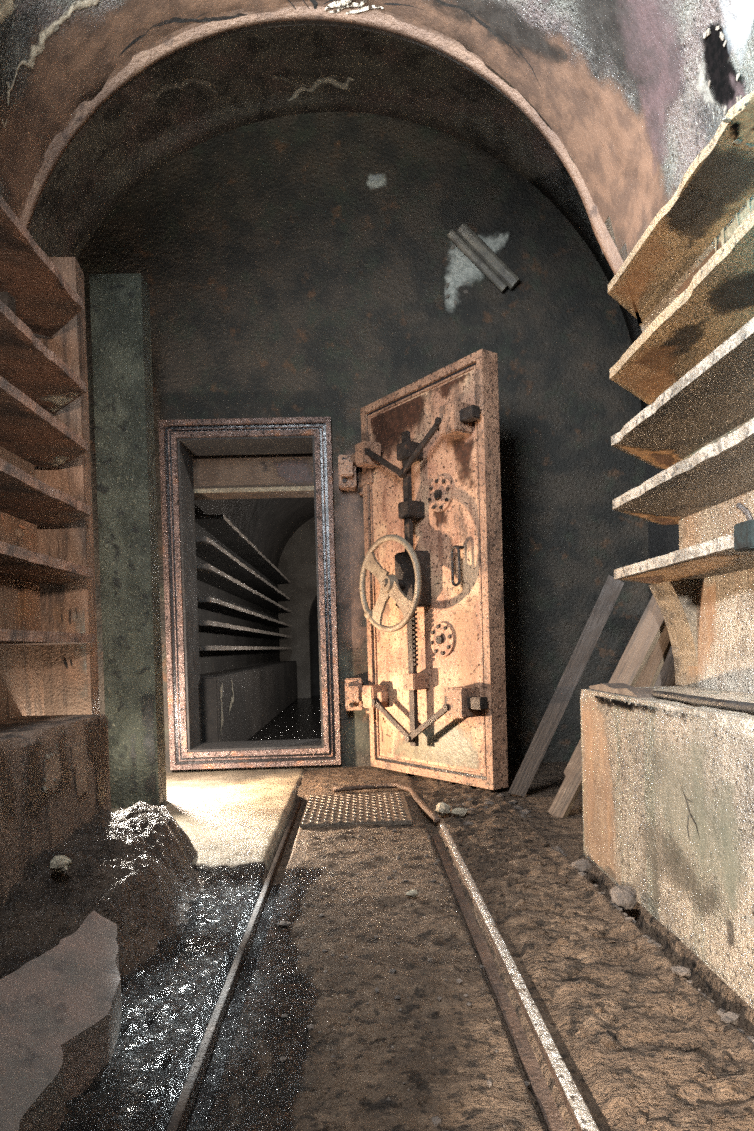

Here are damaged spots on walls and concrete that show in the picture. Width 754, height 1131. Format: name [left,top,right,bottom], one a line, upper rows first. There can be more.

crack [119,12,248,56]
water stain [666,149,754,251]
water stain [707,273,754,315]
water stain [636,321,705,371]
rust [440,374,467,397]
rust [370,395,424,470]
rust [453,439,474,486]
rust [434,511,446,527]
rust [333,451,368,683]